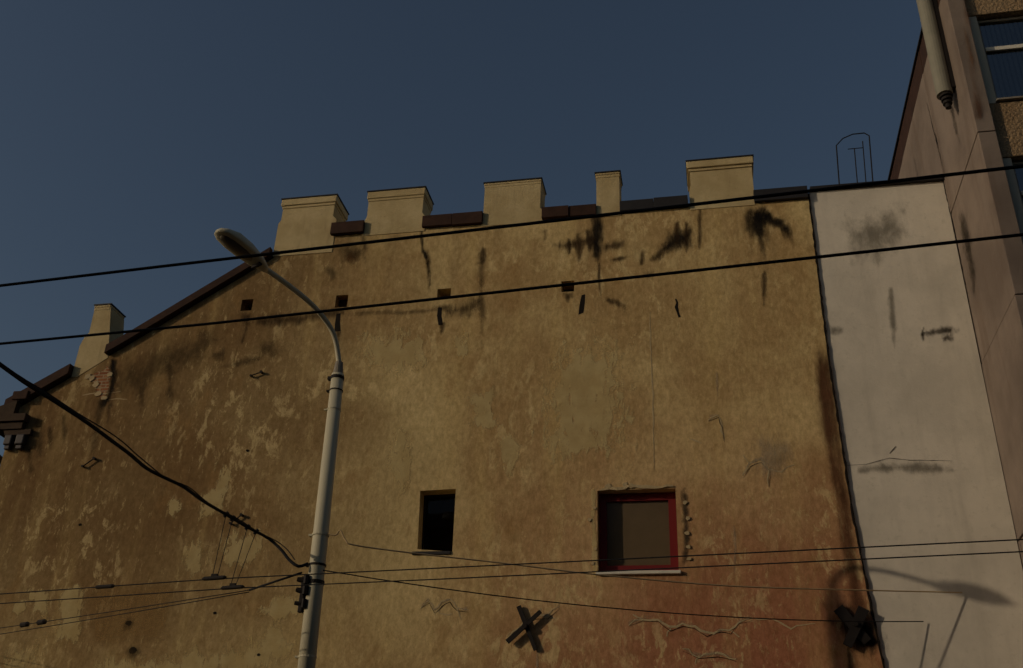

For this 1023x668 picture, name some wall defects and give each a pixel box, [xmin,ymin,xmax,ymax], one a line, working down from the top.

damp [559,217,623,288]
damp [640,209,701,264]
damp [746,210,790,248]
spalling [84,367,125,400]
damp [818,357,877,668]
crack [421,598,468,619]